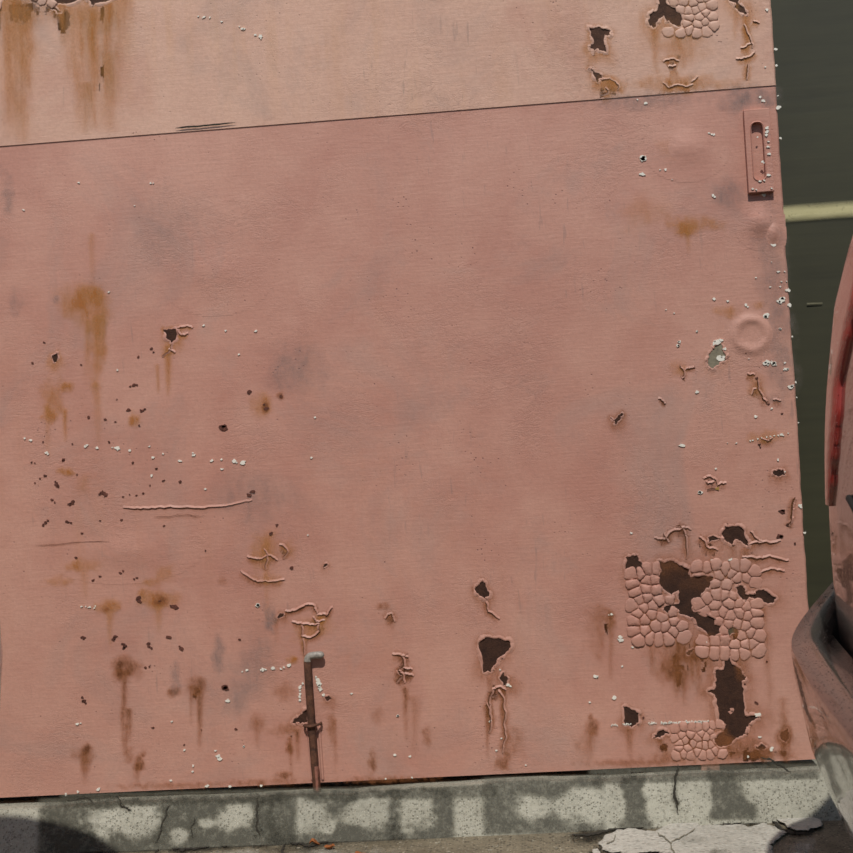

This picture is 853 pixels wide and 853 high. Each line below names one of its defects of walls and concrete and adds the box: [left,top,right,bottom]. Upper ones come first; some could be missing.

peeling [0,0,115,55]
peeling [586,24,614,85]
peeling [704,339,730,373]
peeling [473,577,493,602]
rust [116,660,133,699]
peeling [476,634,515,687]
peeling [618,522,791,761]
peeling [612,696,643,731]
crack [672,766,680,813]
crack [155,797,333,853]
crack [572,827,695,853]
crack [715,821,821,835]